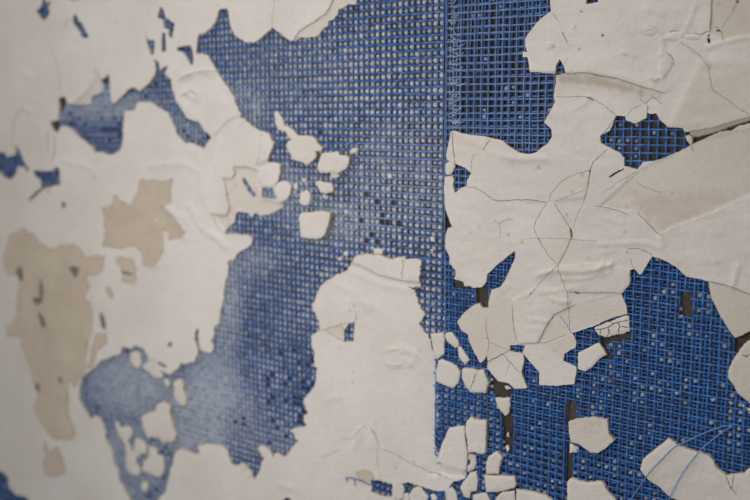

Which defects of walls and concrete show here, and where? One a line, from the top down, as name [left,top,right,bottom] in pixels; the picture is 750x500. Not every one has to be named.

peeling [0,148,60,187]
peeling [3,228,107,441]
peeling [53,9,211,154]
peeling [81,0,566,500]
crack [468,72,663,373]
peeling [431,250,750,500]
peeling [601,113,750,169]